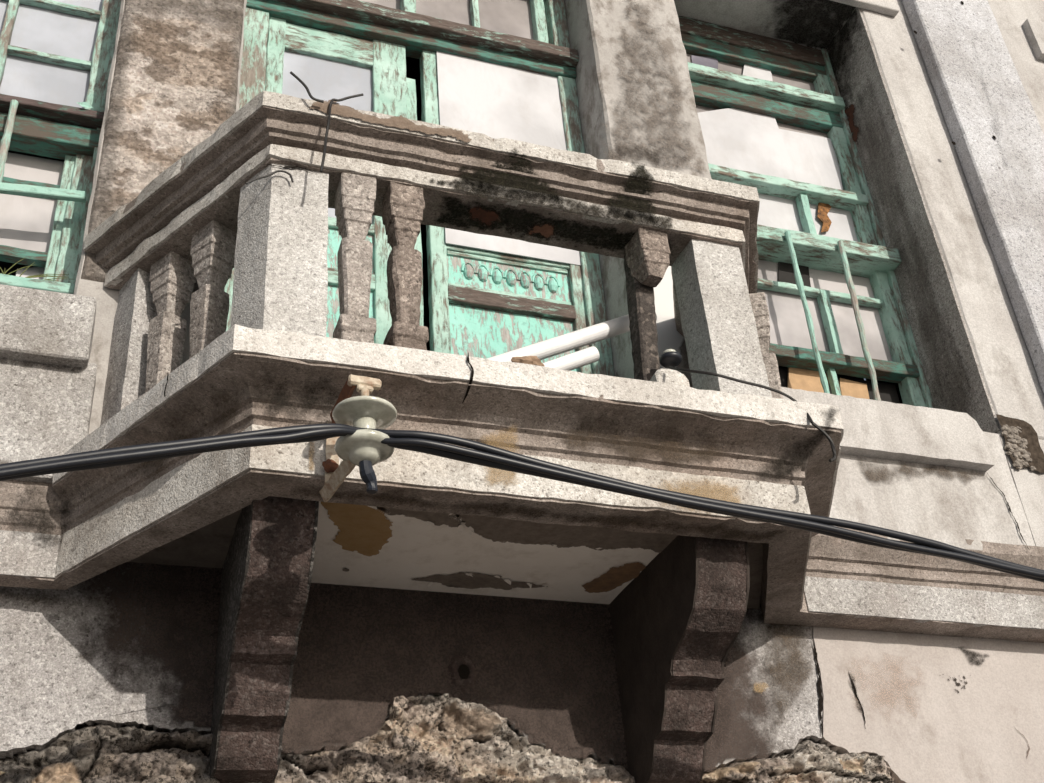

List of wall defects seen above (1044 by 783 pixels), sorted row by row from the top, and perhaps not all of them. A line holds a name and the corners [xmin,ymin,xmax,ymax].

leakage [774,0,858,103]
leakage [430,3,703,251]
crack [462,352,474,404]
leakage [762,409,836,480]
spalling [996,414,1044,473]
crack [987,473,1029,549]
peeling [412,572,549,594]
crack [812,640,823,733]
crack [849,674,866,729]
spalling [0,723,231,783]
spalling [248,694,635,783]
spalling [699,740,894,783]